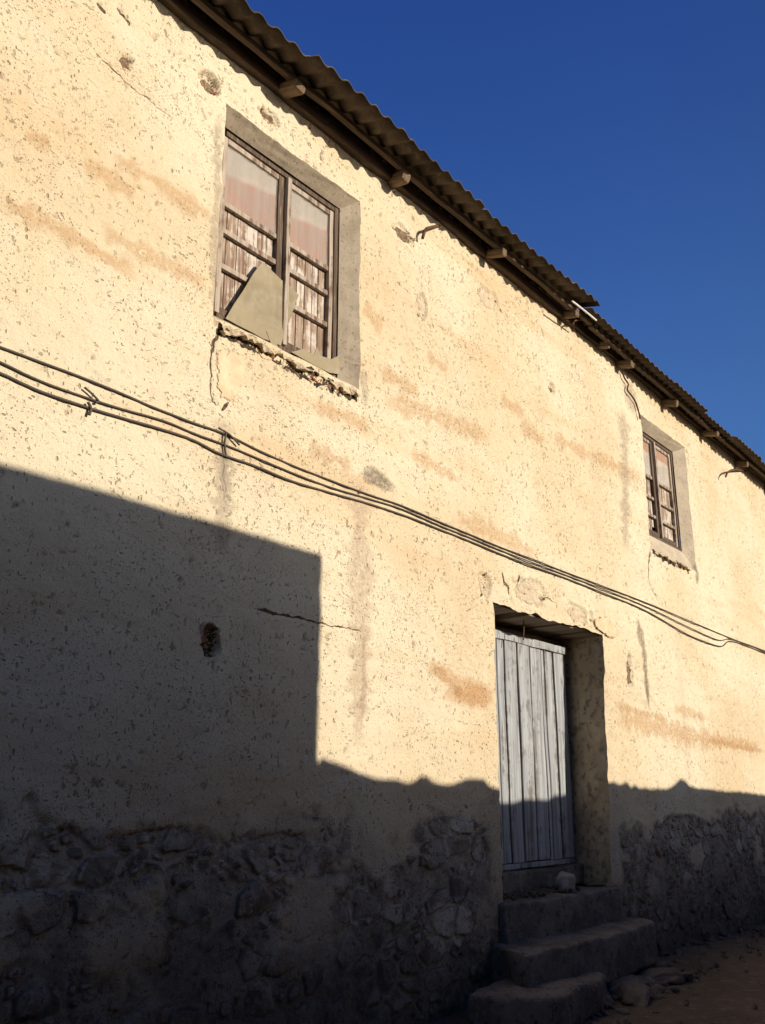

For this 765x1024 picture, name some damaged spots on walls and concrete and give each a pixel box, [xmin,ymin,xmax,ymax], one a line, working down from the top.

flaking render [200,79,221,95]
crack [209,334,229,411]
crack [220,439,228,491]
flaking render [200,622,221,657]
crack [257,608,361,632]
damp [638,626,649,698]